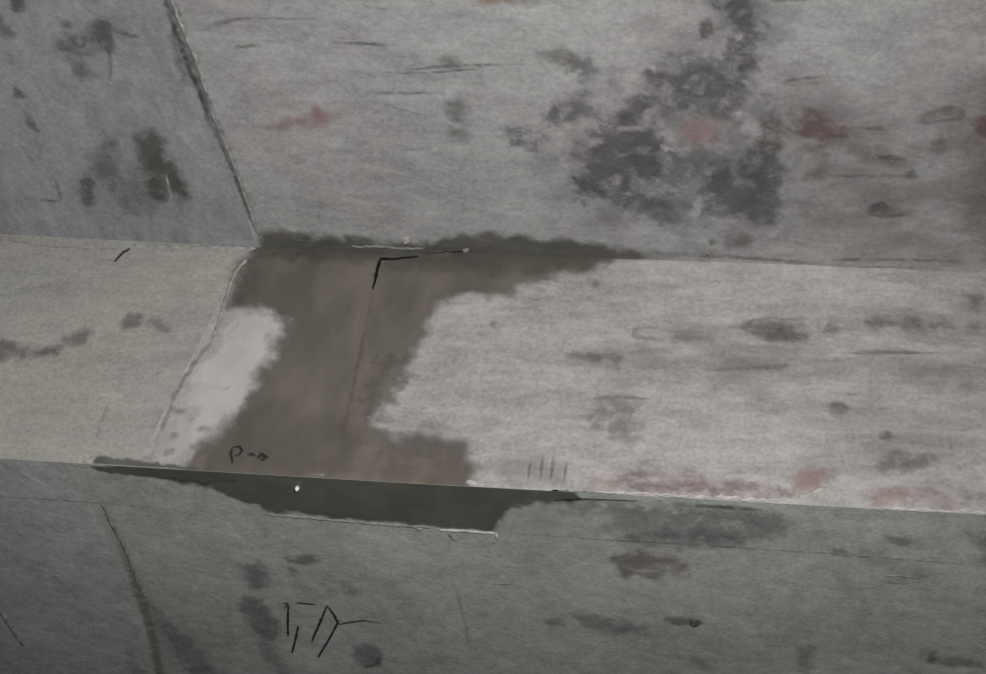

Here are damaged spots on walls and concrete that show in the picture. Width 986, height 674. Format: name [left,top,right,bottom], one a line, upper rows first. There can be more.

water stain [138,136,187,200]
water stain [588,97,660,205]
water stain [113,232,796,544]